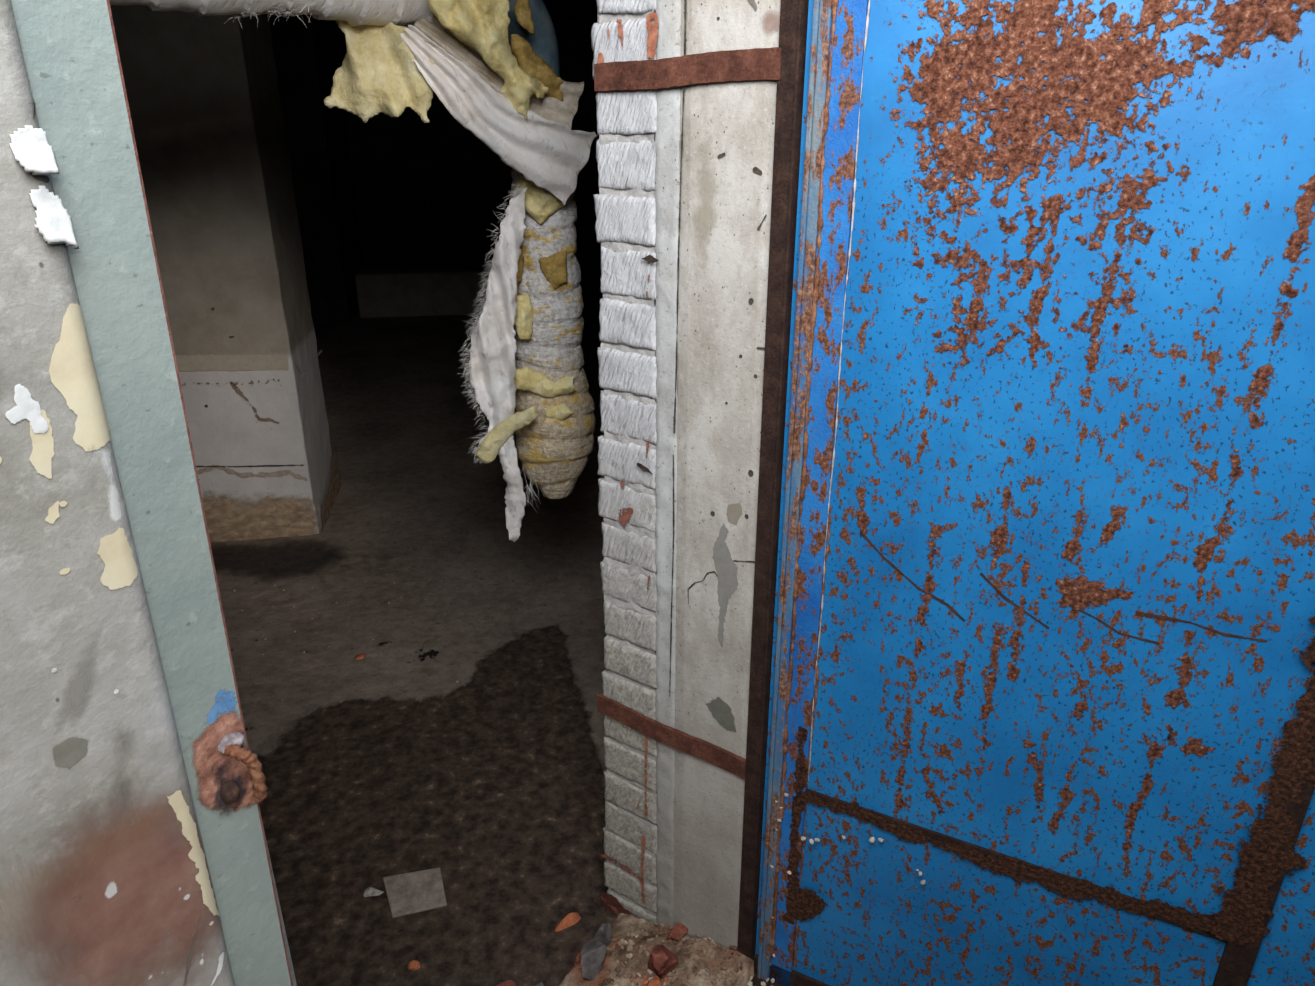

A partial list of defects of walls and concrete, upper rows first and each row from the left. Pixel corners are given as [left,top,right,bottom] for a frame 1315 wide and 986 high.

rust [765,13,779,31]
peeling [9,125,79,249]
peeling [5,384,55,479]
peeling [45,500,67,525]
peeling [49,303,138,590]
crack [196,462,304,470]
crack [230,382,279,424]
rust [770,0,1315,968]
rust [193,712,256,811]
rust [0,807,217,986]
peeling [167,790,219,925]